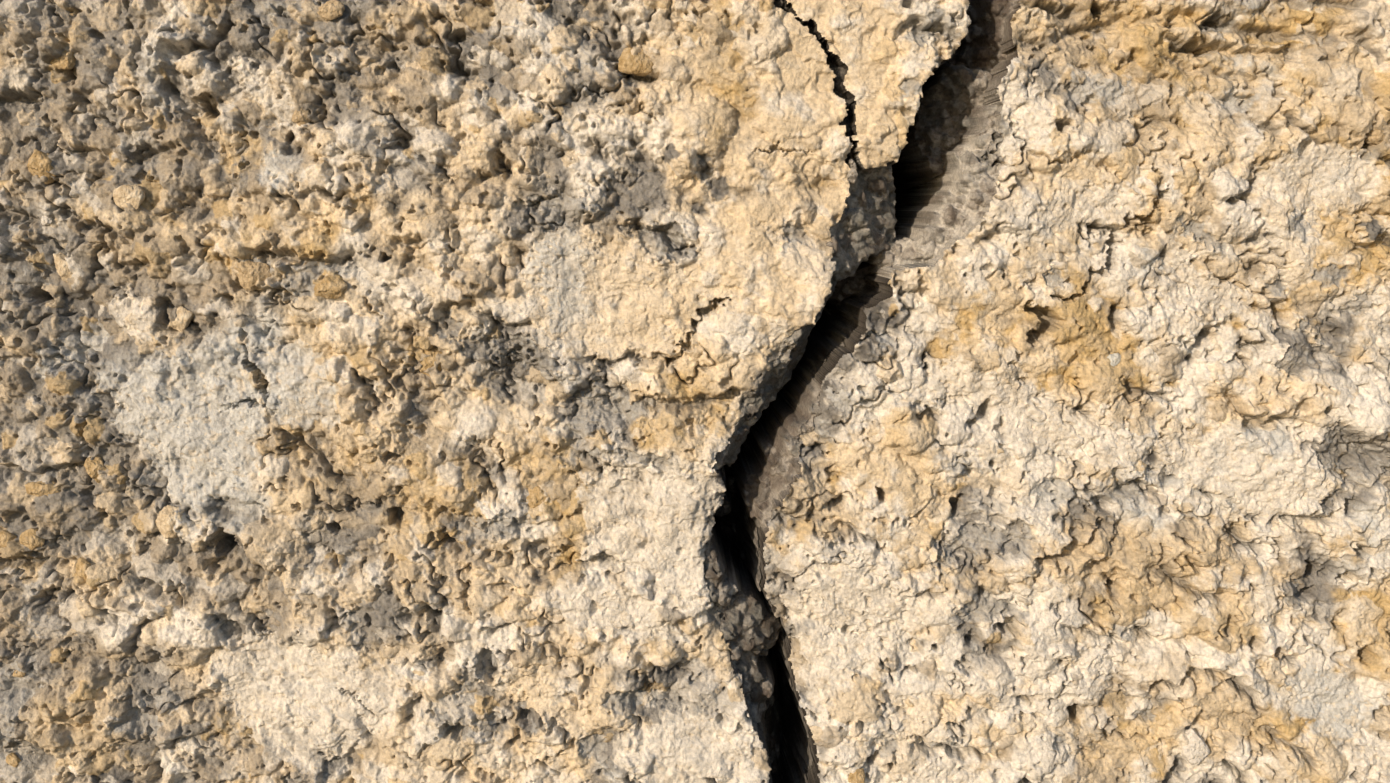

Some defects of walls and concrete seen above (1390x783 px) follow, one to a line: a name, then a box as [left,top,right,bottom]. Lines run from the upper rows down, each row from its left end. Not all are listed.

crack [666,297,732,368]
crack [703,0,1021,783]